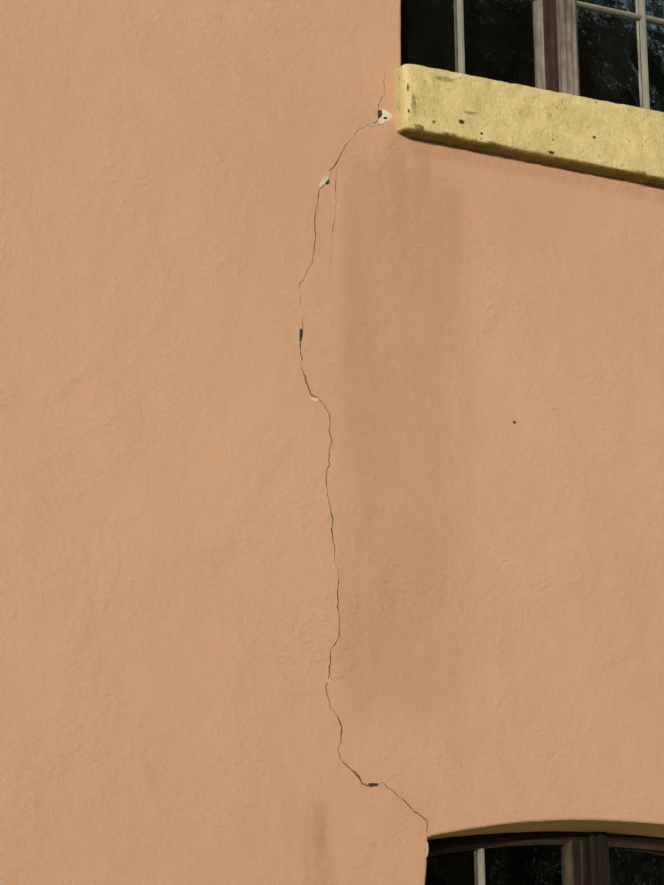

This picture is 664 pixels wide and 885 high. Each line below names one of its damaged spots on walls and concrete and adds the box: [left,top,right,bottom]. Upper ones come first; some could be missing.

crack [296,69,430,837]